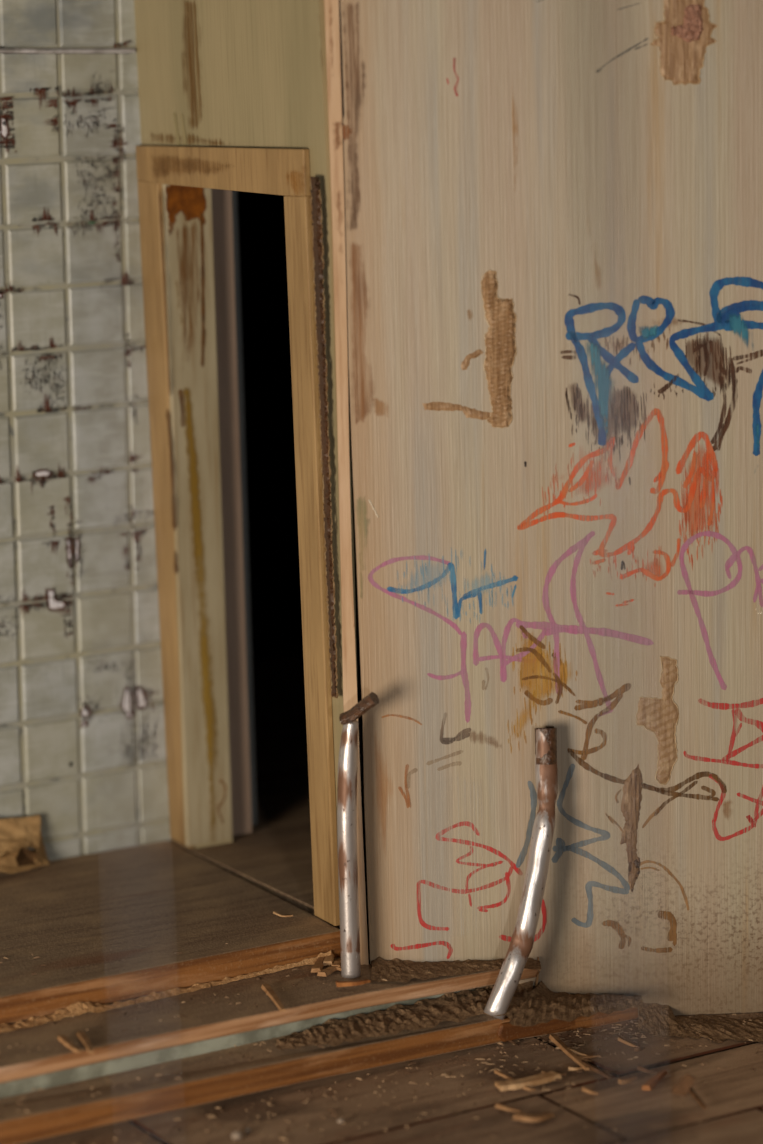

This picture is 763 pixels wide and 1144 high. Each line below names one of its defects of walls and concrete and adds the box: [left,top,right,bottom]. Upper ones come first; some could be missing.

spalling [0,97,16,154]
rust [155,158,208,368]
spalling [0,337,91,413]
spalling [422,270,517,428]
spalling [0,464,66,492]
spalling [0,497,85,638]
spalling [78,660,161,760]
spalling [633,656,689,911]